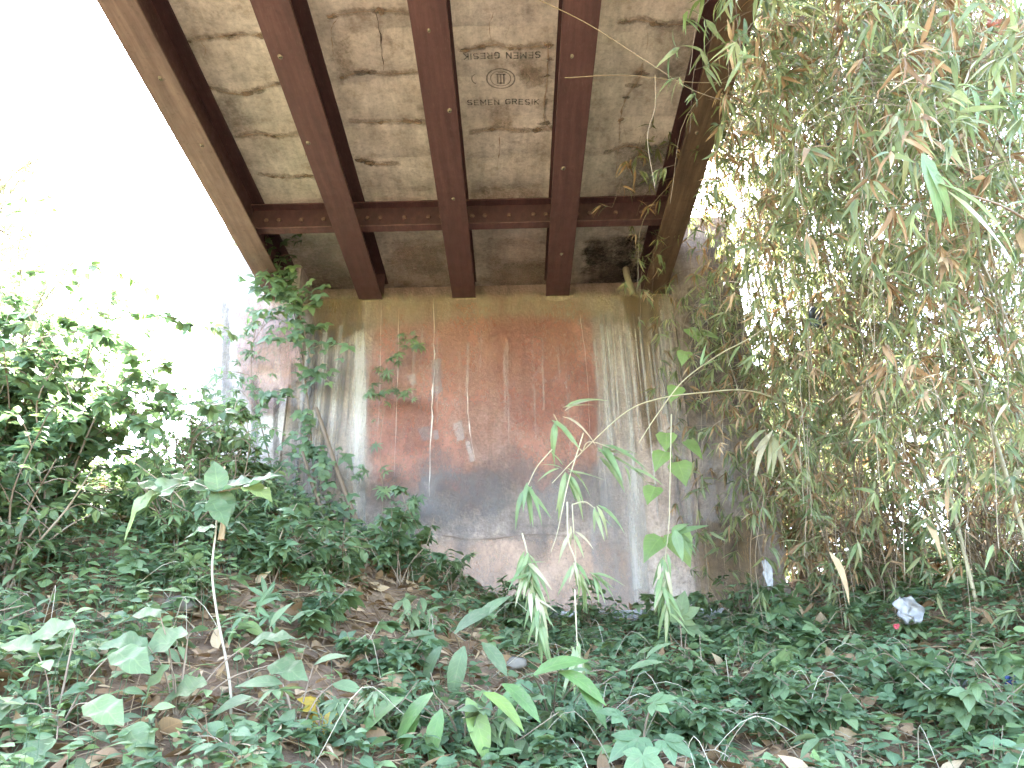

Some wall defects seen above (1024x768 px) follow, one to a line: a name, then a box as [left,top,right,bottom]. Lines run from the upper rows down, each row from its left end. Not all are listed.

crack [327,6,418,83]
leakage [583,234,645,283]
leakage [292,282,450,503]
rust [367,297,602,502]
leakage [474,282,721,484]
leakage [351,452,646,612]